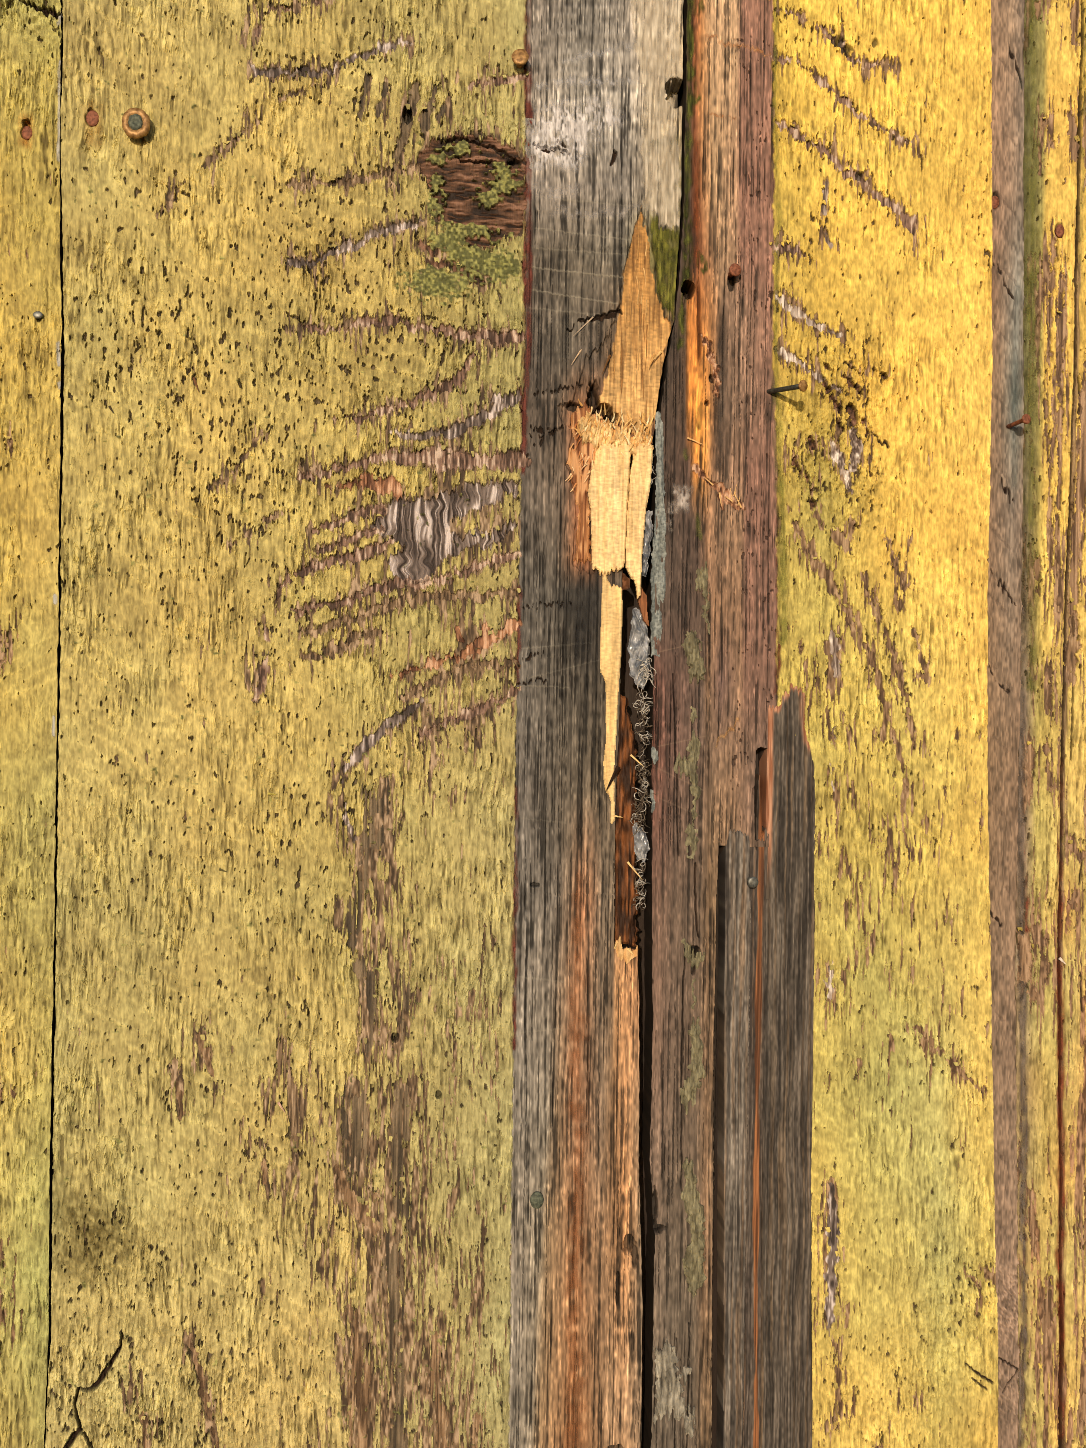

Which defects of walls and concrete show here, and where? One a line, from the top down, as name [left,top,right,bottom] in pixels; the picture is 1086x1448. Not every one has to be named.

peeling [251,39,408,122]
peeling [287,81,446,191]
peeling [776,120,916,235]
peeling [286,222,485,285]
peeling [304,314,525,424]
peeling [775,293,842,337]
peeling [775,347,860,413]
peeling [275,391,531,660]
peeling [791,428,863,494]
peeling [1033,239,1086,711]
peeling [334,1085,412,1448]
crack [63,1332,123,1448]